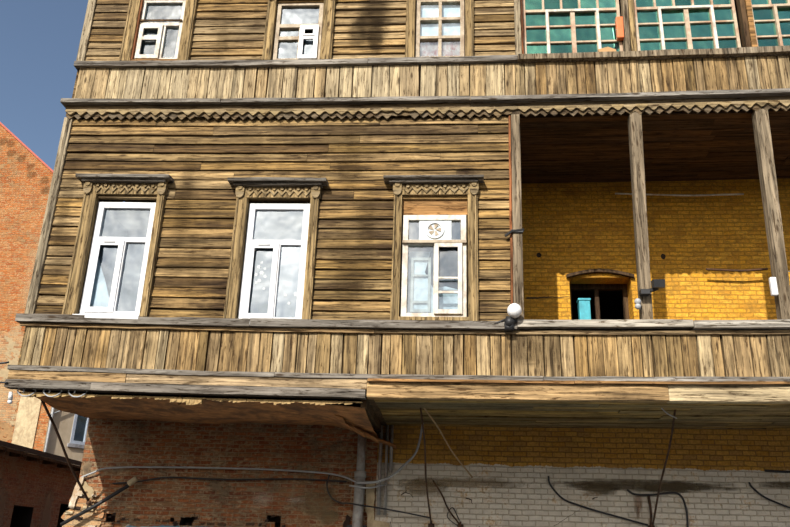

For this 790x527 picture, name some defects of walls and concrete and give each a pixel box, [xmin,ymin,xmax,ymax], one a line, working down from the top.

peeling [0,324,397,449]
spalling [61,477,203,527]
spalling [365,483,390,527]